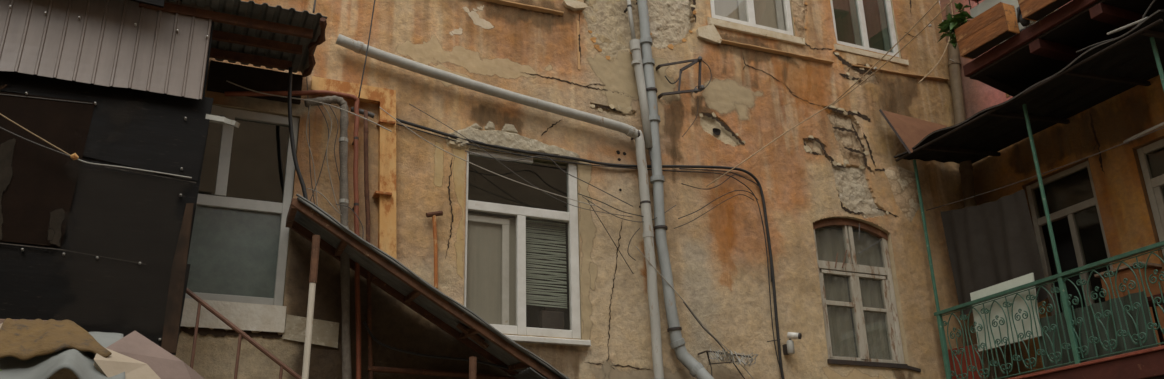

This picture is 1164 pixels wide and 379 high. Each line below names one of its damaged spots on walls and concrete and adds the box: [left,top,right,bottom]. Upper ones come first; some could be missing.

peeling [587,50,639,116]
flaking render [647,0,696,104]
flaking render [803,110,889,218]